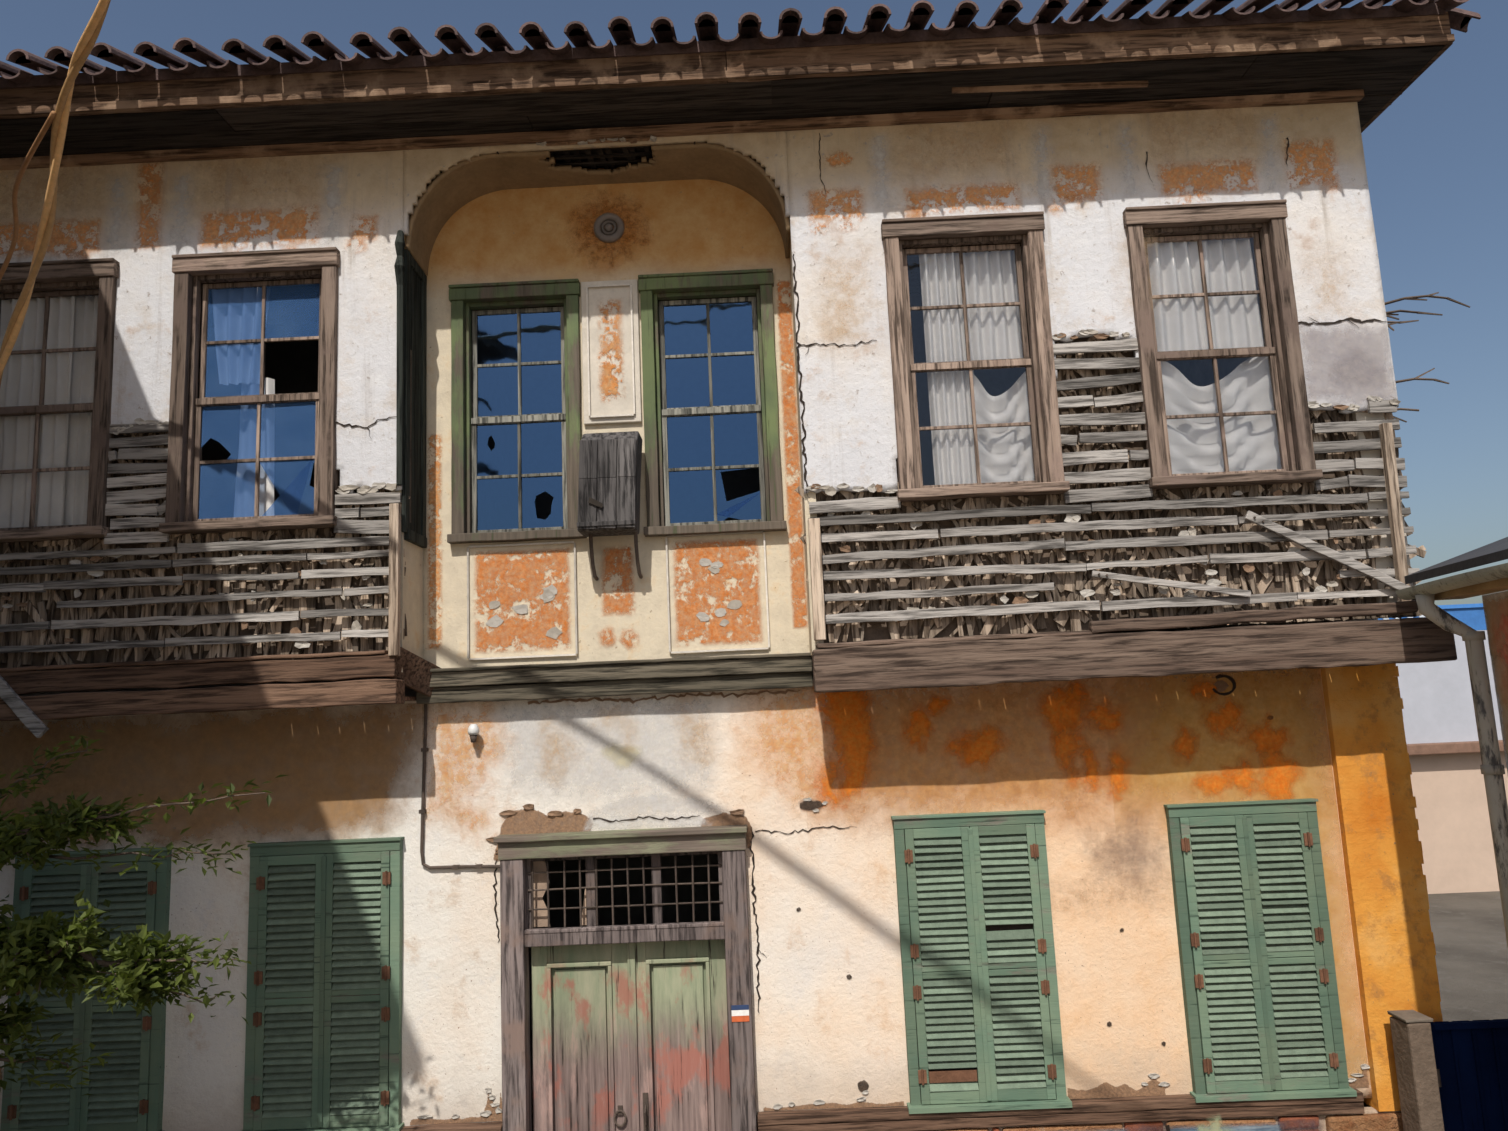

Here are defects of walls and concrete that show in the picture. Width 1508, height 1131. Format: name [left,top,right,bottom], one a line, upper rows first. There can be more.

peeling [202,207,316,252]
peeling [907,185,1017,215]
peeling [1162,161,1255,201]
peeling [1288,142,1337,186]
crack [1298,317,1387,328]
peeling [777,281,898,627]
peeling [476,550,569,651]
peeling [675,540,760,643]
peeling [760,690,876,812]
peeling [1040,683,1126,798]
peeling [1174,674,1297,800]
crack [749,826,854,1012]